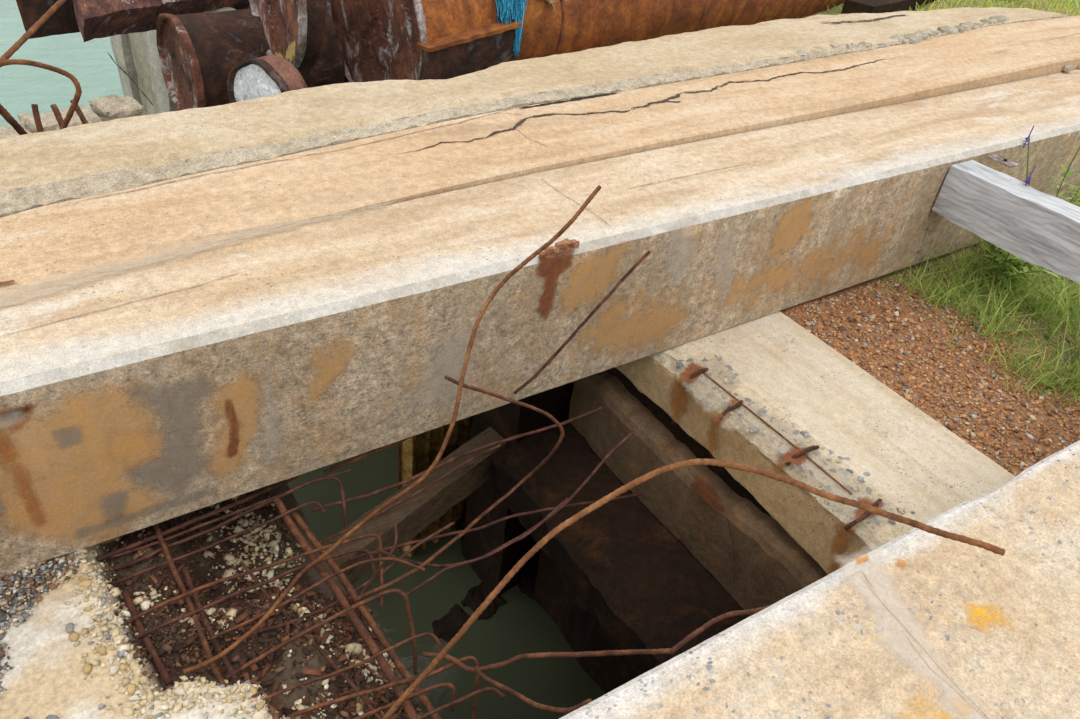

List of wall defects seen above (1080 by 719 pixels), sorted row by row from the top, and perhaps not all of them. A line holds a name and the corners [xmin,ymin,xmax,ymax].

crack [67,51,883,205]
corrosion [537,238,580,319]
corrosion [0,405,44,525]
spalling [96,185,1005,719]
corrosion [776,445,807,473]
corrosion [828,498,883,574]